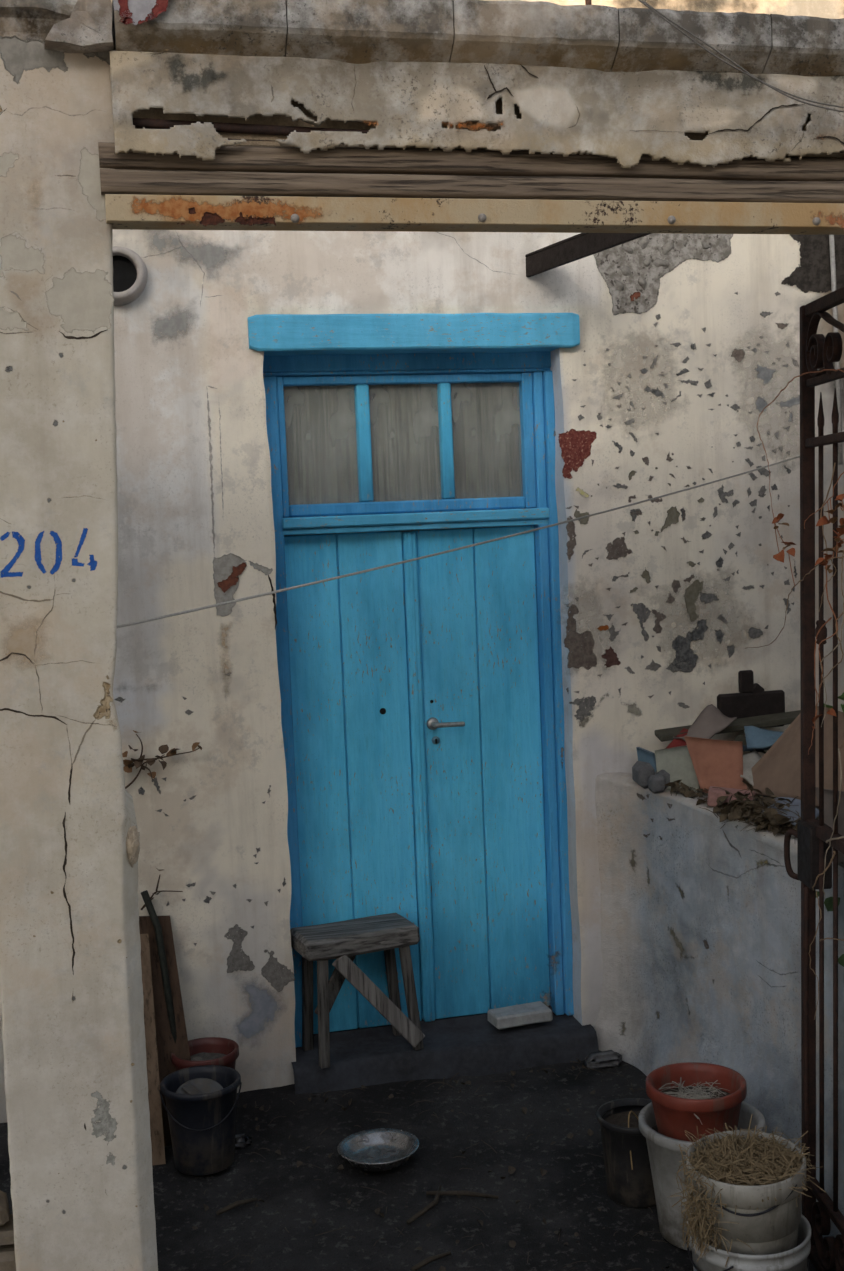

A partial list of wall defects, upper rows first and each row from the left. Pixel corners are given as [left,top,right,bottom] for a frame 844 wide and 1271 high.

spalling [0,0,114,84]
crack [484,64,538,99]
crack [709,104,844,149]
peeling [78,148,110,221]
corrosion [131,196,322,227]
spalling [593,233,733,327]
peeling [775,234,844,296]
peeling [554,328,800,677]
spalling [213,553,273,616]
peeling [566,688,596,721]
crack [0,591,102,1001]
peeling [225,924,295,992]